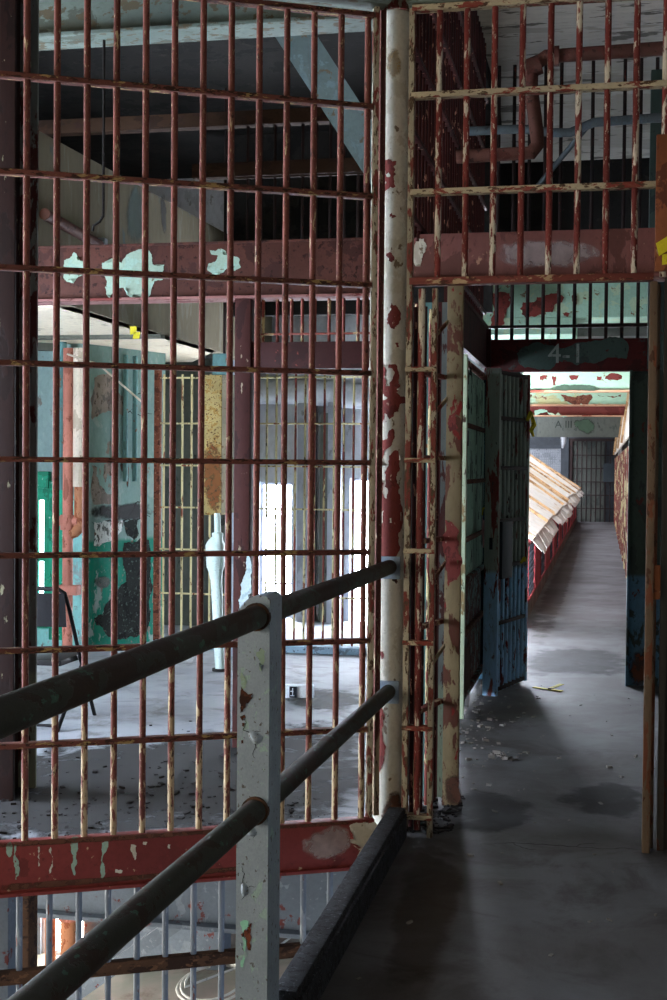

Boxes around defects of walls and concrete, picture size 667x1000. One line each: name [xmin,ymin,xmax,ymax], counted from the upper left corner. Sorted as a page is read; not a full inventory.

peeling [63,252,83,283]
peeling [102,249,164,298]
peeling [207,249,241,275]
peeling [387,303,401,329]
peeling [561,394,621,405]
corrosion [204,443,222,512]
peeling [381,364,405,556]
peeling [442,520,463,584]
flaking render [94,519,153,640]
leakage [567,784,640,816]
peeling [71,837,79,875]
peeling [100,841,122,878]